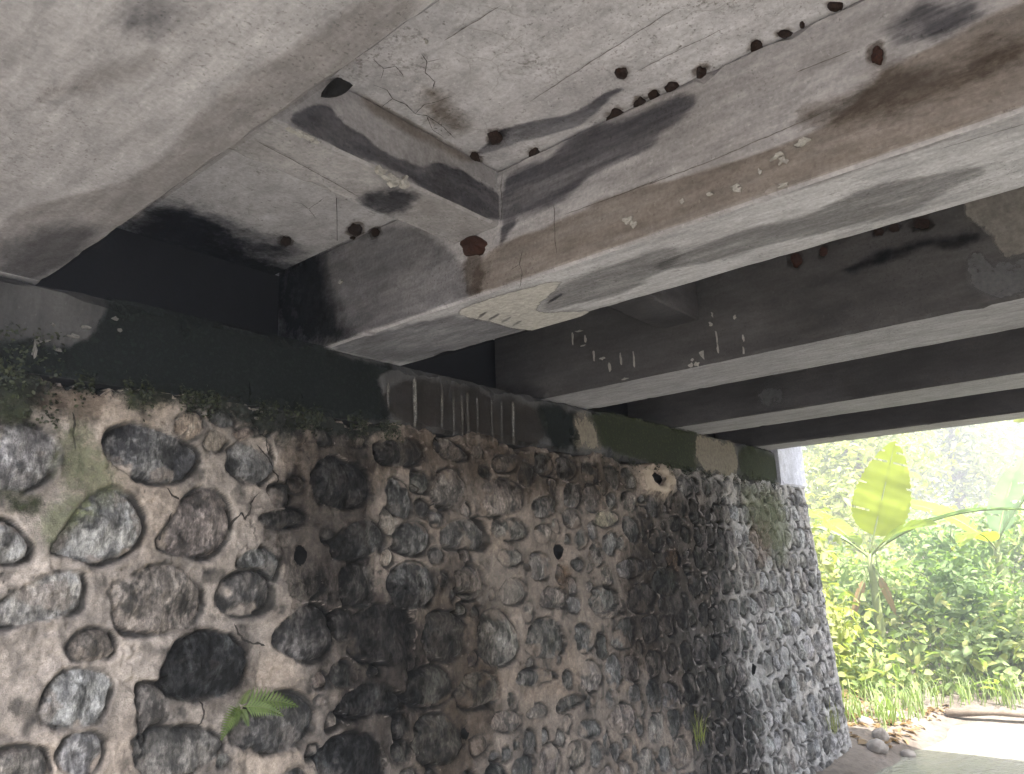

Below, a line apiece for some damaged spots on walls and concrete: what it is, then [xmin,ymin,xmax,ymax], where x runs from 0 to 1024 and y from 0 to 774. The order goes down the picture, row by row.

corrosion [750,39,763,52]
corrosion [777,21,805,39]
corrosion [827,2,843,12]
crack [373,56,455,139]
corrosion [614,68,628,80]
corrosion [606,81,679,121]
damp [504,98,692,197]
damp [293,106,586,241]
corrosion [460,235,488,295]
damp [845,235,978,272]
peeling [459,282,589,330]
damp [0,209,581,774]